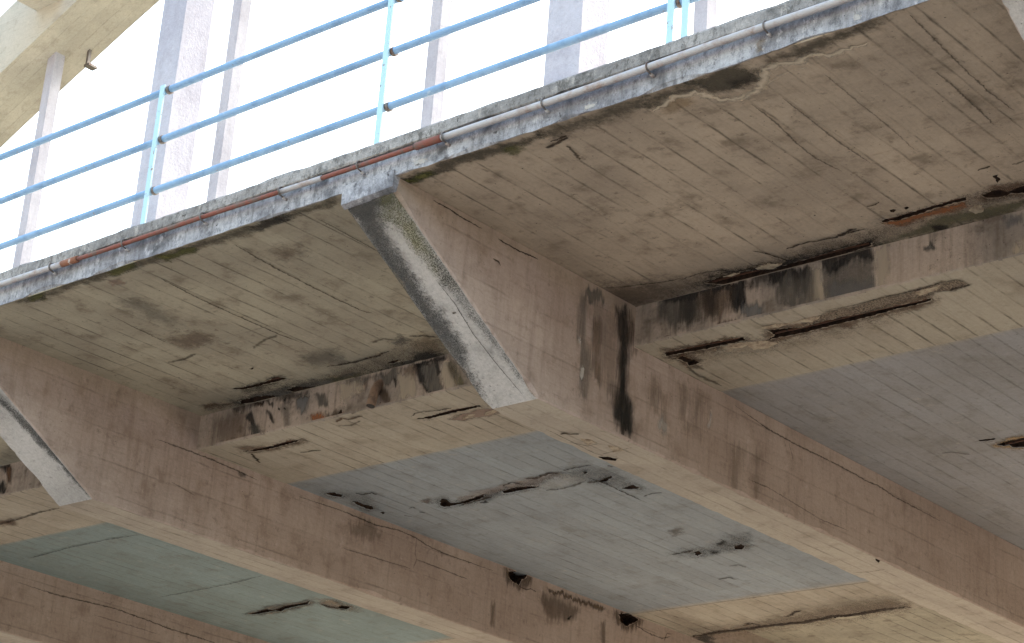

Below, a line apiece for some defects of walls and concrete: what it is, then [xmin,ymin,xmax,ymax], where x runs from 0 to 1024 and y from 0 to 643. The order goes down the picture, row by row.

spalling [703,240,877,289]
damp [659,218,926,328]
damp [222,194,464,435]
spalling [662,280,970,364]
spalling [204,374,363,408]
damp [614,305,637,435]
spalling [439,435,642,509]
crack [735,405,940,521]
spalling [986,436,1024,449]
spalling [506,570,536,592]
spalling [616,611,669,640]
spalling [693,600,911,643]